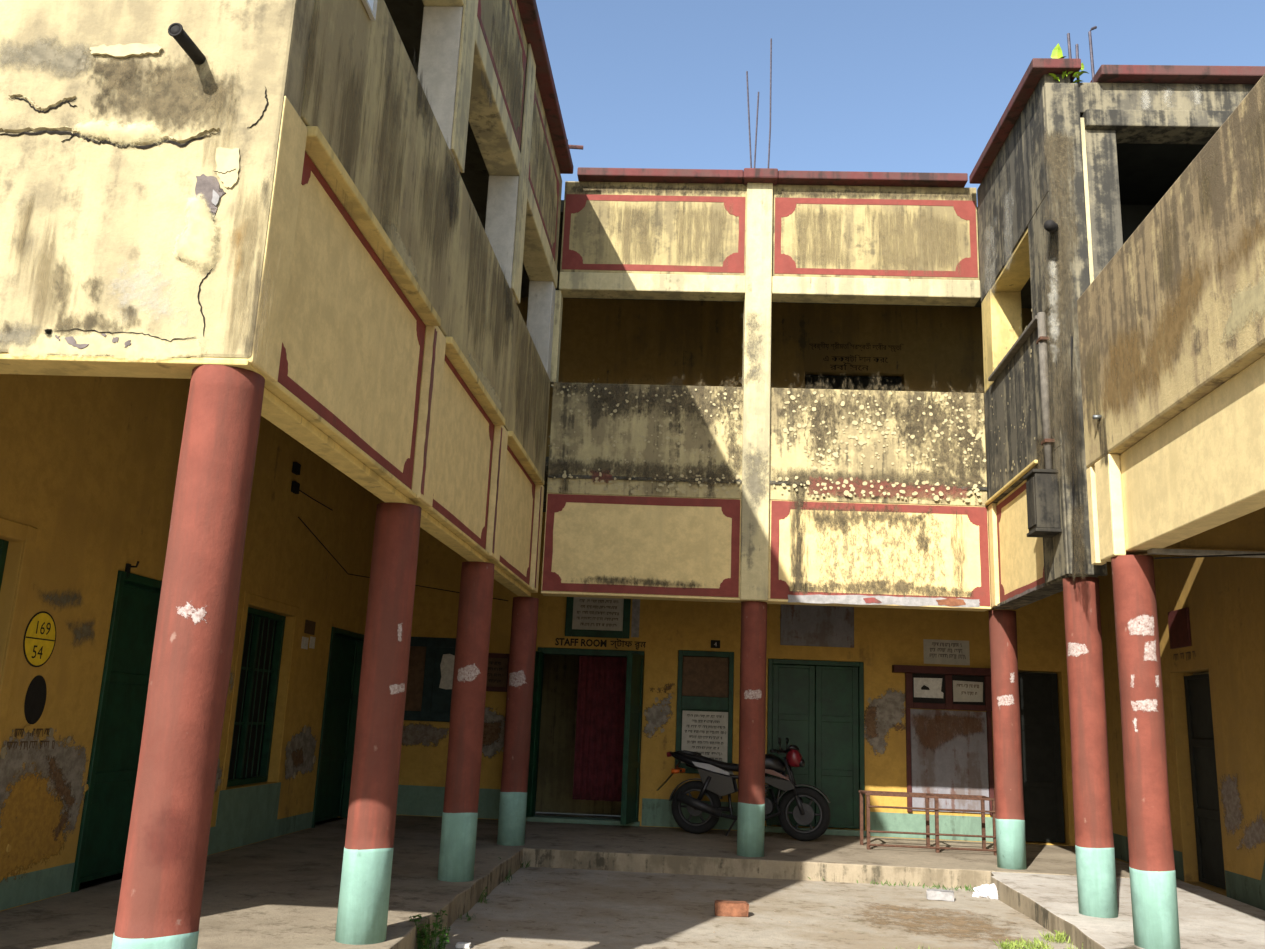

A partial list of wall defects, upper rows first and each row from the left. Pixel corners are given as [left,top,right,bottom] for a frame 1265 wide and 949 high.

water stain [0,38,233,129]
crack [0,87,268,149]
water stain [413,54,430,119]
peeling [195,147,240,218]
crack [57,268,213,342]
water stain [1037,132,1263,482]
water stain [423,146,986,598]
water stain [1071,501,1086,579]
flaking render [643,683,675,738]
flaking render [864,688,906,756]
flaking render [0,724,89,882]
flaking render [1220,773,1265,850]